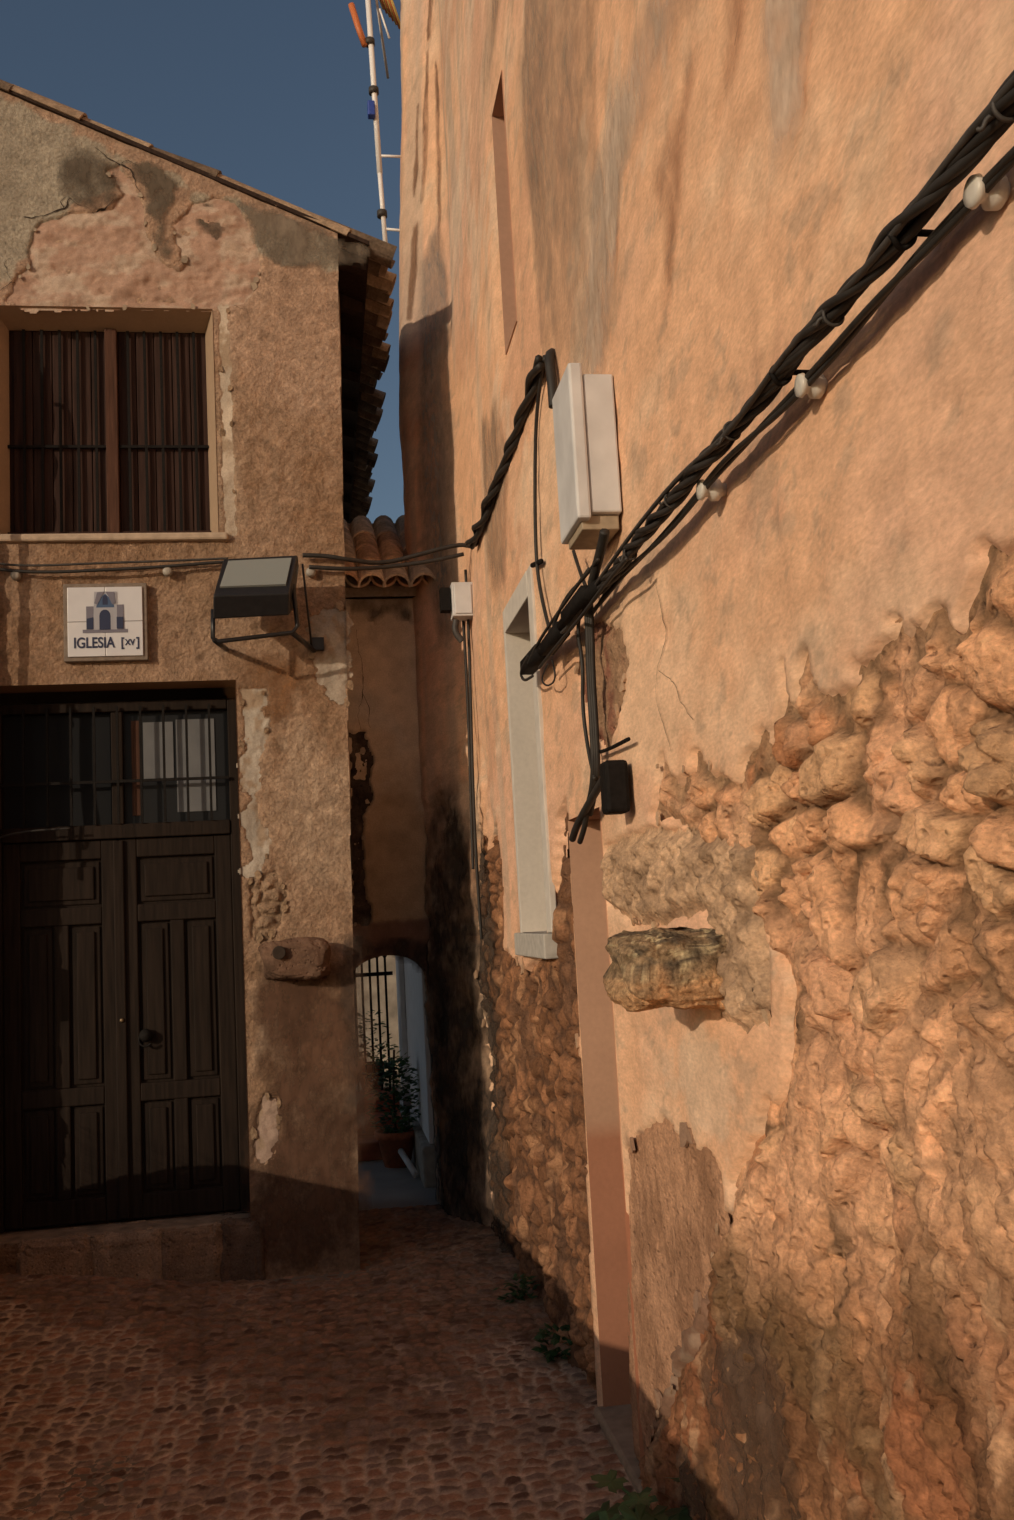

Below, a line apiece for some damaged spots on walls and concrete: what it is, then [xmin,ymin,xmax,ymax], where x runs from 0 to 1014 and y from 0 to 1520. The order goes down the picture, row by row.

water stain [60,156,115,205]
water stain [132,162,175,254]
water stain [198,204,221,240]
water stain [243,206,368,266]
peeling [6,165,260,542]
peeling [305,600,354,707]
spalling [574,621,629,748]
peeling [236,688,289,943]
water stain [249,792,513,1265]
spalling [600,544,1014,1520]
peeling [249,1092,282,1164]
spalling [473,813,597,1390]